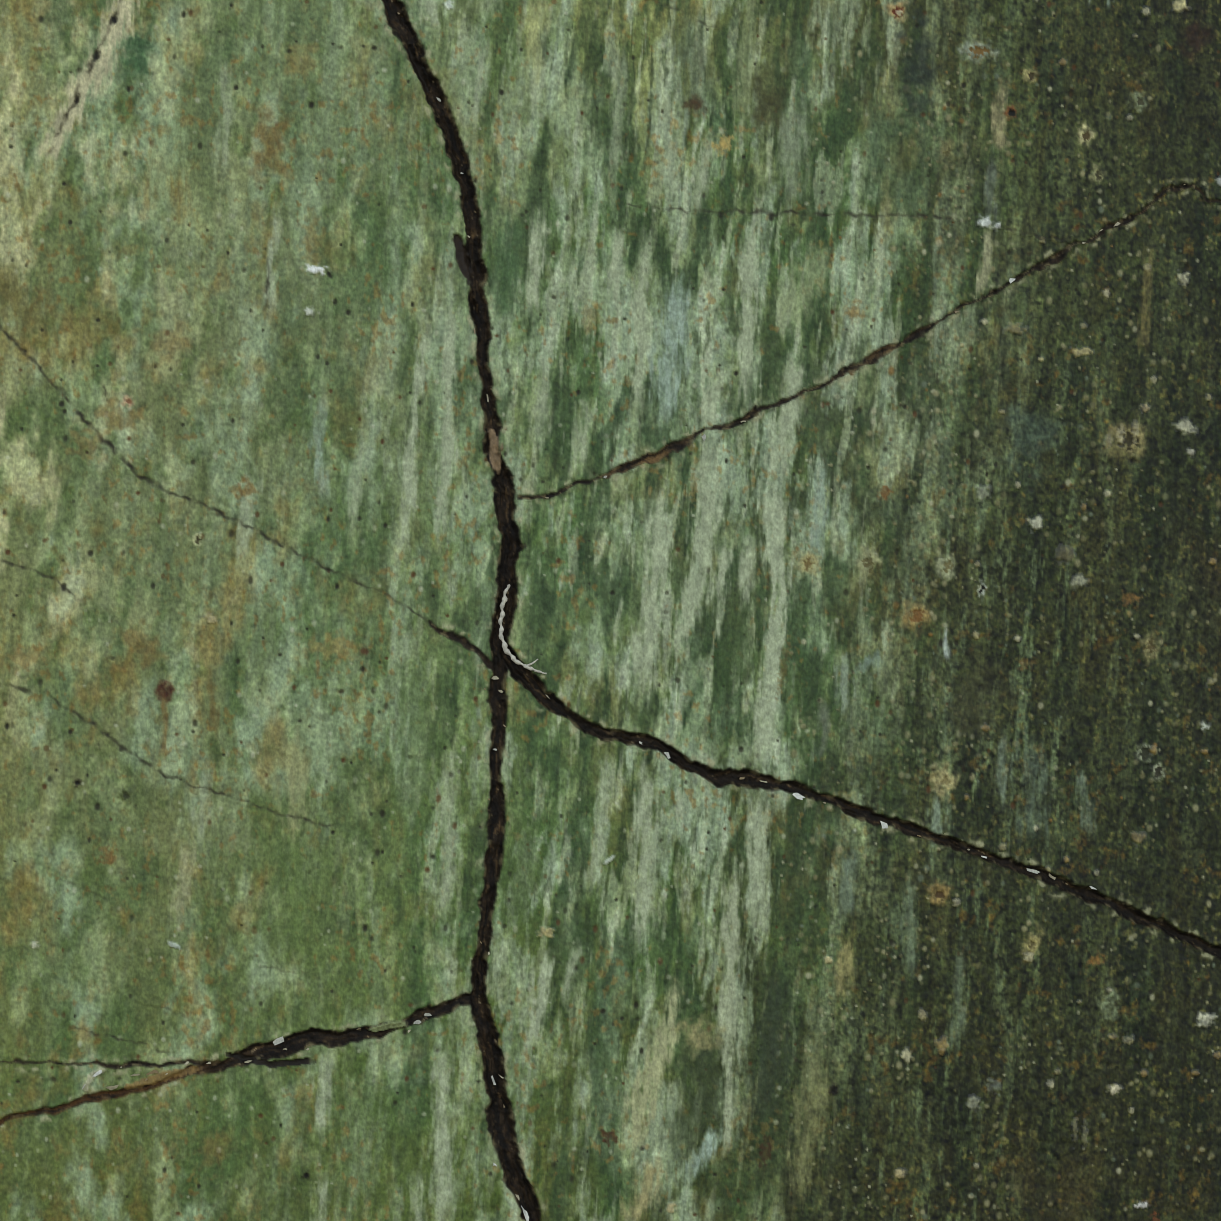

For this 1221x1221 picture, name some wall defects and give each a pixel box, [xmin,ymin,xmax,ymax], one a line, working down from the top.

crack [45,0,125,157]
crack [261,255,272,328]
crack [0,322,431,624]
crack [380,0,1221,1221]
crack [0,682,338,828]
crack [0,992,475,1128]